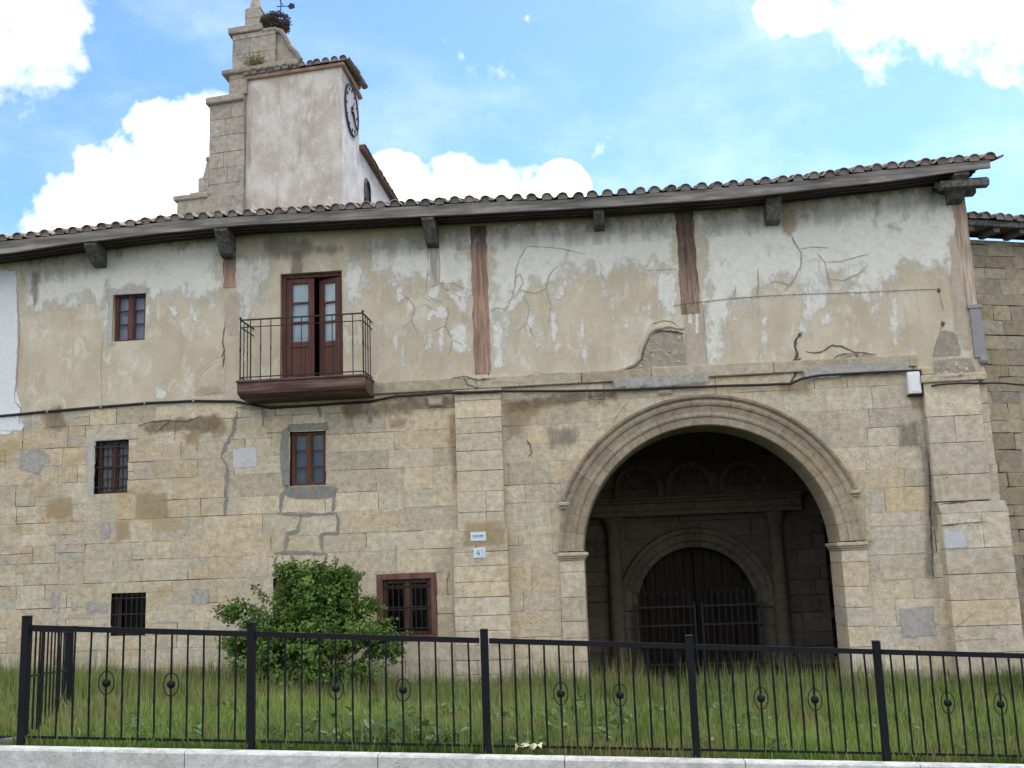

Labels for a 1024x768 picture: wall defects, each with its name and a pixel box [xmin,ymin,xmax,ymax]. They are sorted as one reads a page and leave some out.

peeling [0,239,275,435]
crack [398,248,567,388]
crack [491,246,582,337]
peeling [489,188,956,371]
crack [734,230,868,298]
crack [783,336,877,386]
flaking render [934,331,975,377]